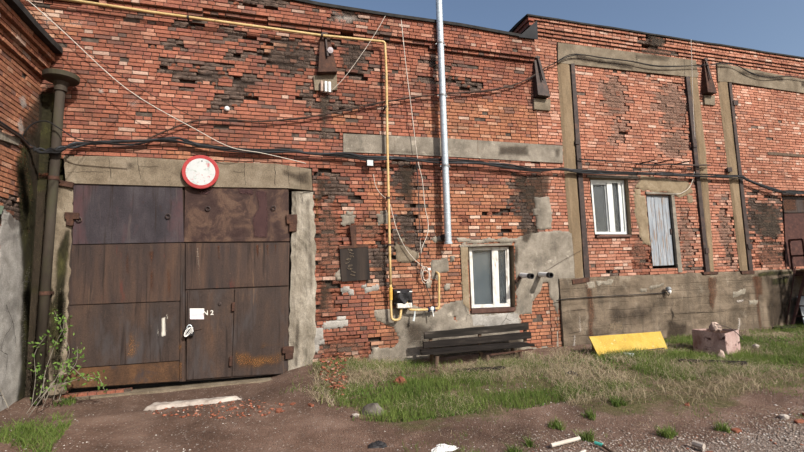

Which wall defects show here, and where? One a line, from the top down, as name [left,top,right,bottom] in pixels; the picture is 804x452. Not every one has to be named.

spalling [172,21,205,30]
spalling [229,0,290,11]
spalling [149,26,364,116]
water stain [23,86,54,398]
water stain [43,294,60,399]
peeling [312,161,619,362]
peeling [621,172,703,275]
water stain [668,322,686,336]
water stain [768,280,792,326]